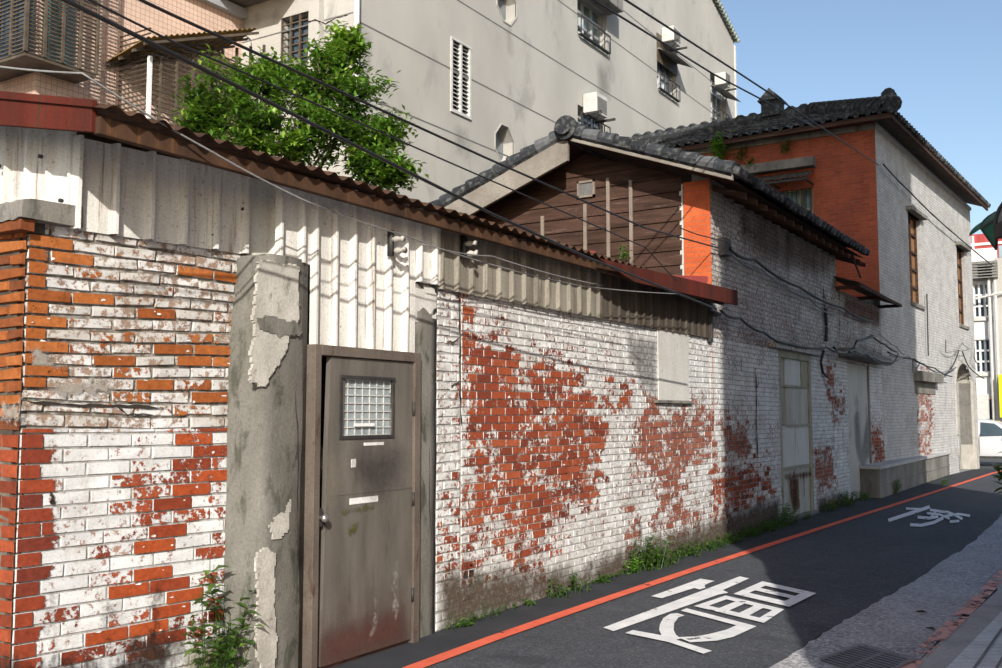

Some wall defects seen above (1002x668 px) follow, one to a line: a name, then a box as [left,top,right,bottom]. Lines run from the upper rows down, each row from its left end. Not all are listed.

peeling [24,234,237,415]
peeling [248,260,302,387]
peeling [415,287,444,322]
crack [27,401,161,416]
peeling [437,294,779,584]
peeling [813,359,847,505]
peeling [915,394,935,456]
peeling [13,428,228,668]
peeling [268,499,291,540]
water stain [442,502,778,623]